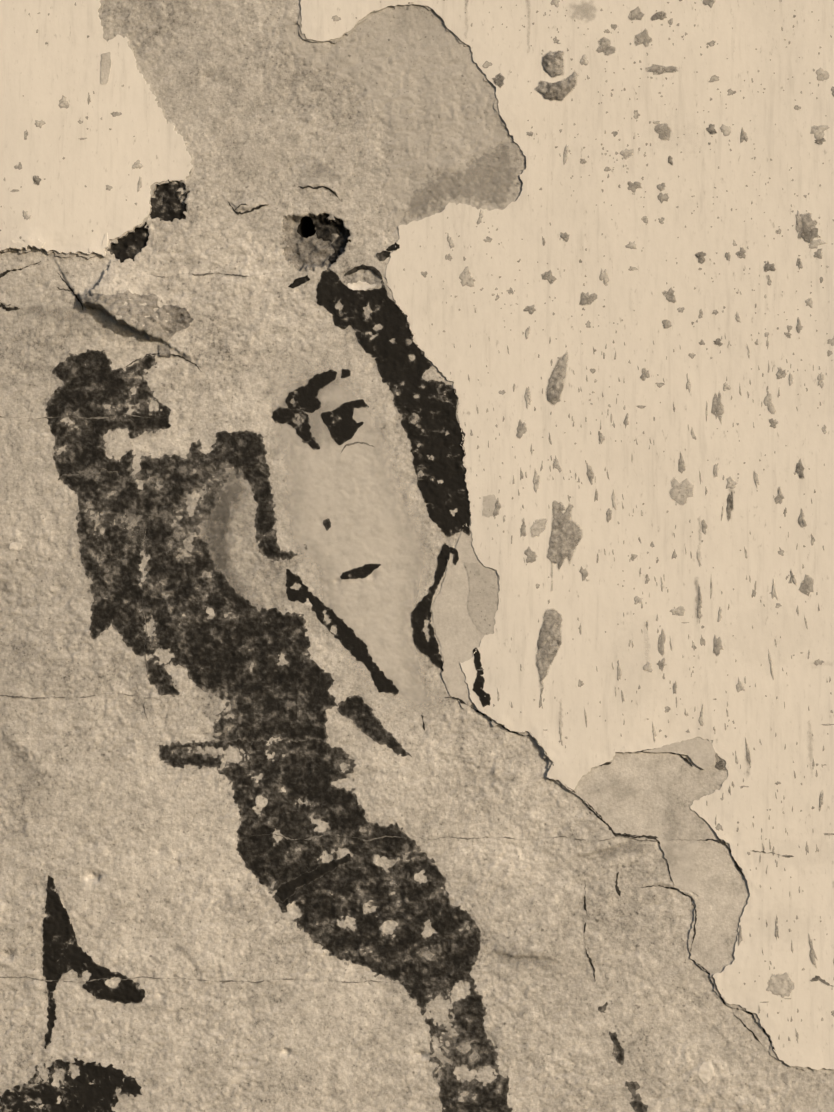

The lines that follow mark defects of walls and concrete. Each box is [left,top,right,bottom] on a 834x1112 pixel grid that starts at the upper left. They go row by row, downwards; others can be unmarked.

peeling [0,0,193,259]
peeling [282,3,526,229]
crack [0,261,83,311]
spalling [281,213,383,291]
peeling [431,524,500,709]
peeling [482,494,498,517]
crack [273,697,794,1055]
peeling [573,737,750,973]